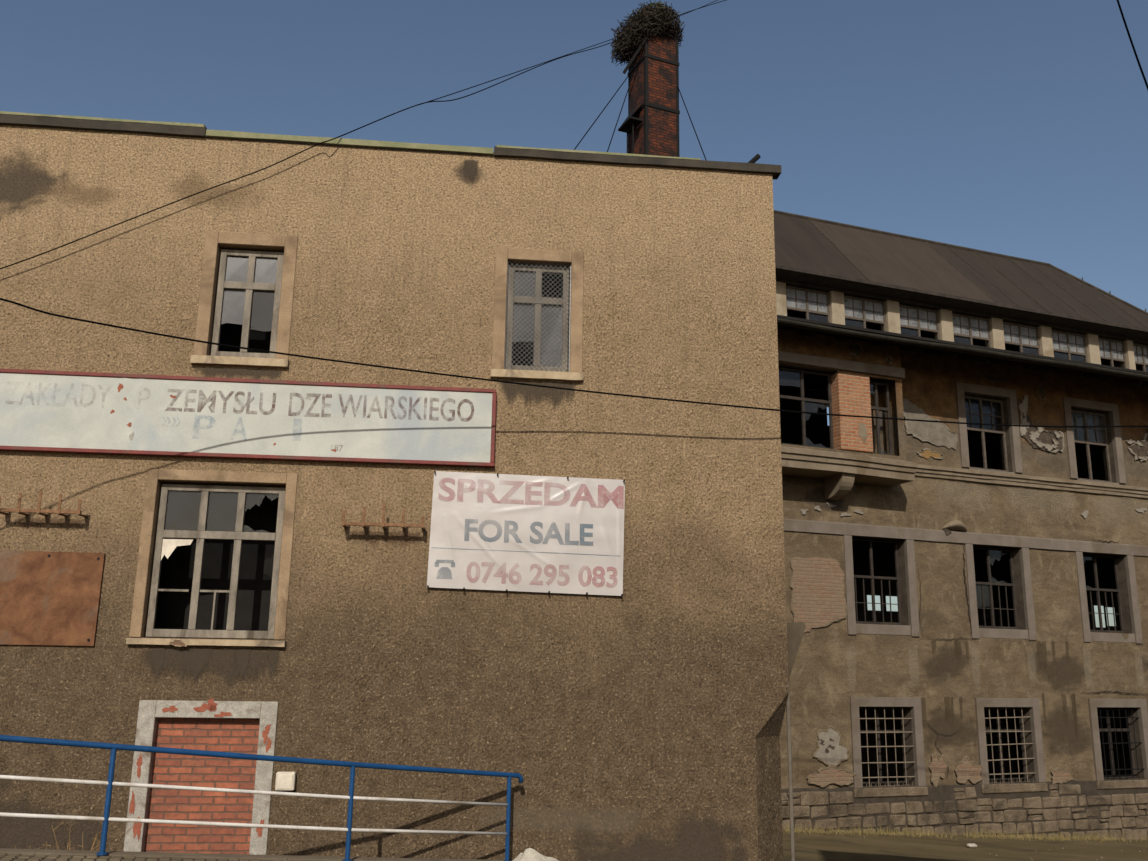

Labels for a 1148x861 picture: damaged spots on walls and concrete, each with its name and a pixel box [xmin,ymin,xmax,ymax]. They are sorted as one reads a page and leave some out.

leakage [0,159,56,209]
leakage [459,160,478,181]
flaking render [1018,395,1065,454]
flaking render [1126,427,1148,462]
flaking render [790,556,847,633]
spalling [807,725,857,787]
flaking render [929,752,983,788]